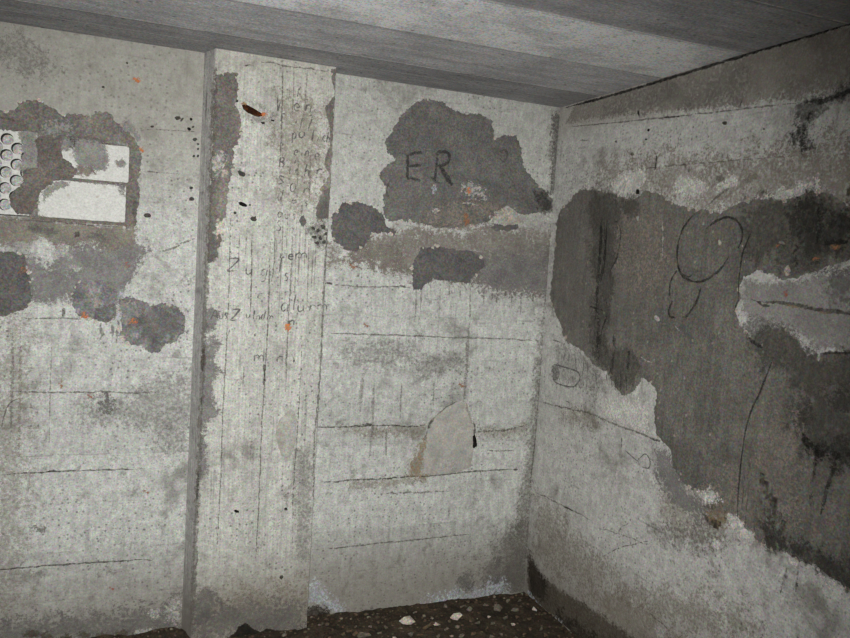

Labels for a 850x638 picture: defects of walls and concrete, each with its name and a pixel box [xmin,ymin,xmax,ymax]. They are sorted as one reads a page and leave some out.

peeling [0,98,151,229]
peeling [206,71,251,263]
peeling [0,251,33,317]
peeling [62,279,188,353]
peeling [299,69,850,593]